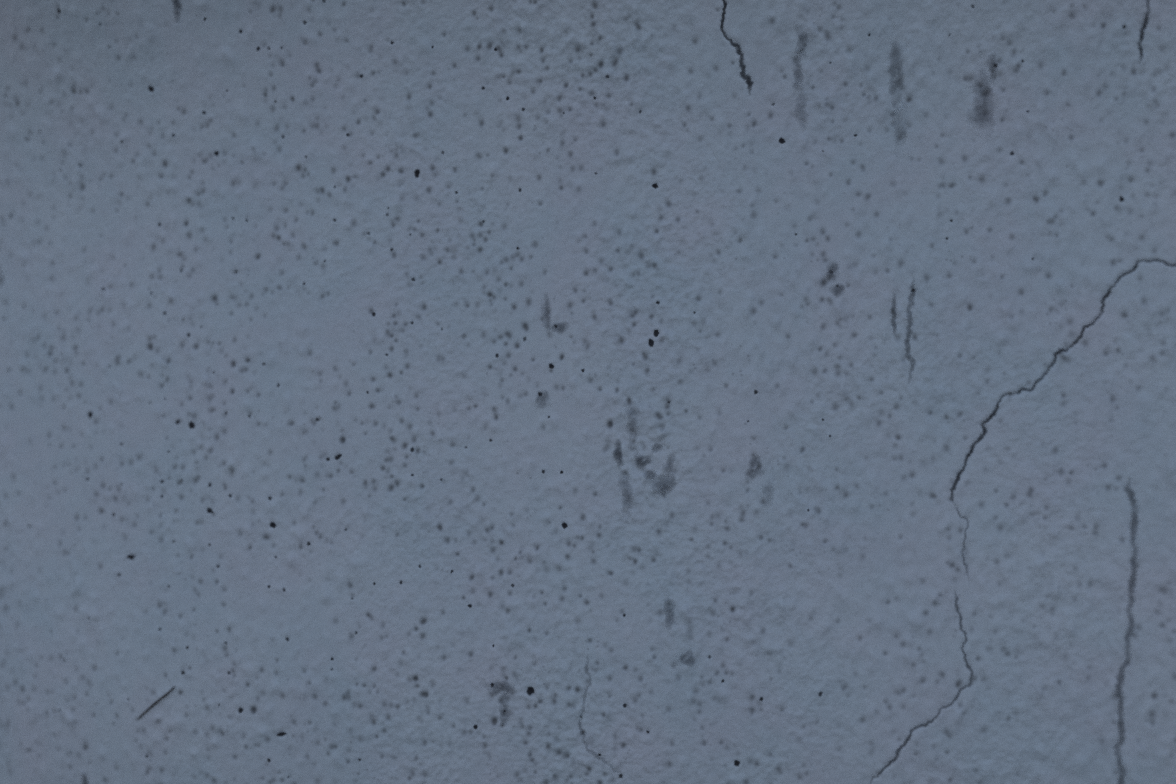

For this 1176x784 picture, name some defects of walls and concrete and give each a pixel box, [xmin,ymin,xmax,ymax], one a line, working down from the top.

crack [721,0,753,88]
crack [951,259,1176,494]
crack [885,721,932,767]